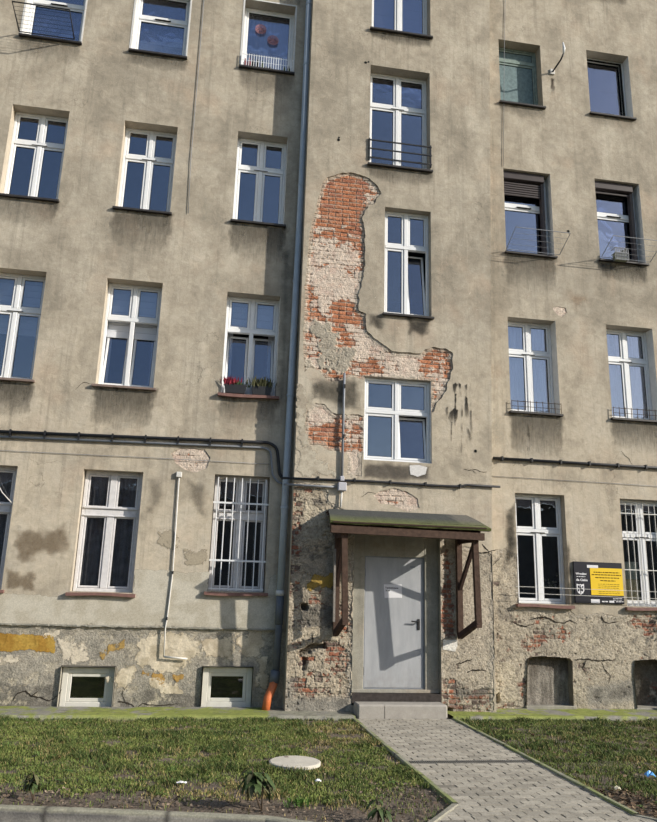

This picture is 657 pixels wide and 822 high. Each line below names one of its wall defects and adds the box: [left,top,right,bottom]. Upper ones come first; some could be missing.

spalling [303,173,453,413]
water stain [447,383,472,434]
spalling [295,384,364,479]
spalling [171,448,210,473]
spalling [373,488,419,512]
water stain [17,530,66,559]
water stain [8,573,33,589]
crack [512,616,577,627]
peeling [0,630,89,664]
peeling [106,631,269,694]
crack [574,658,613,682]
crack [13,689,62,701]